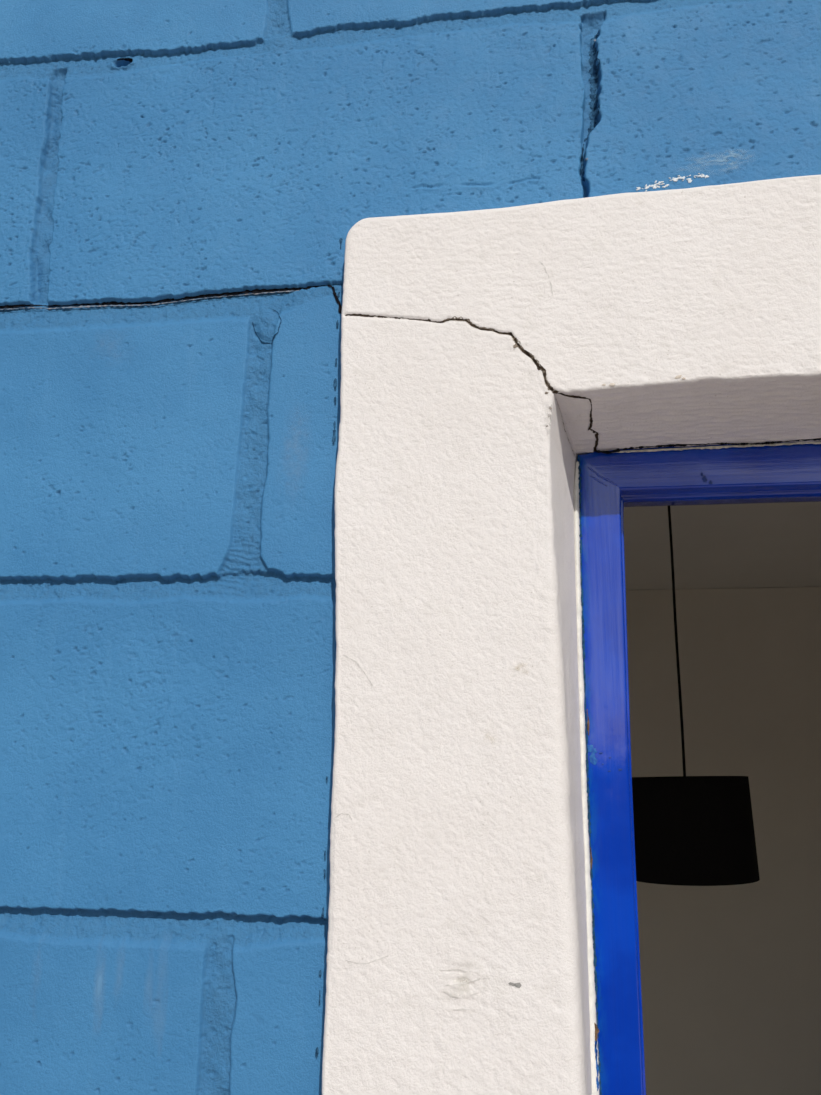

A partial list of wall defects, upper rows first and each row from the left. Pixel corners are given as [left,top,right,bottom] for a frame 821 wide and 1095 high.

crack [581,30,600,182]
crack [0,285,821,1095]